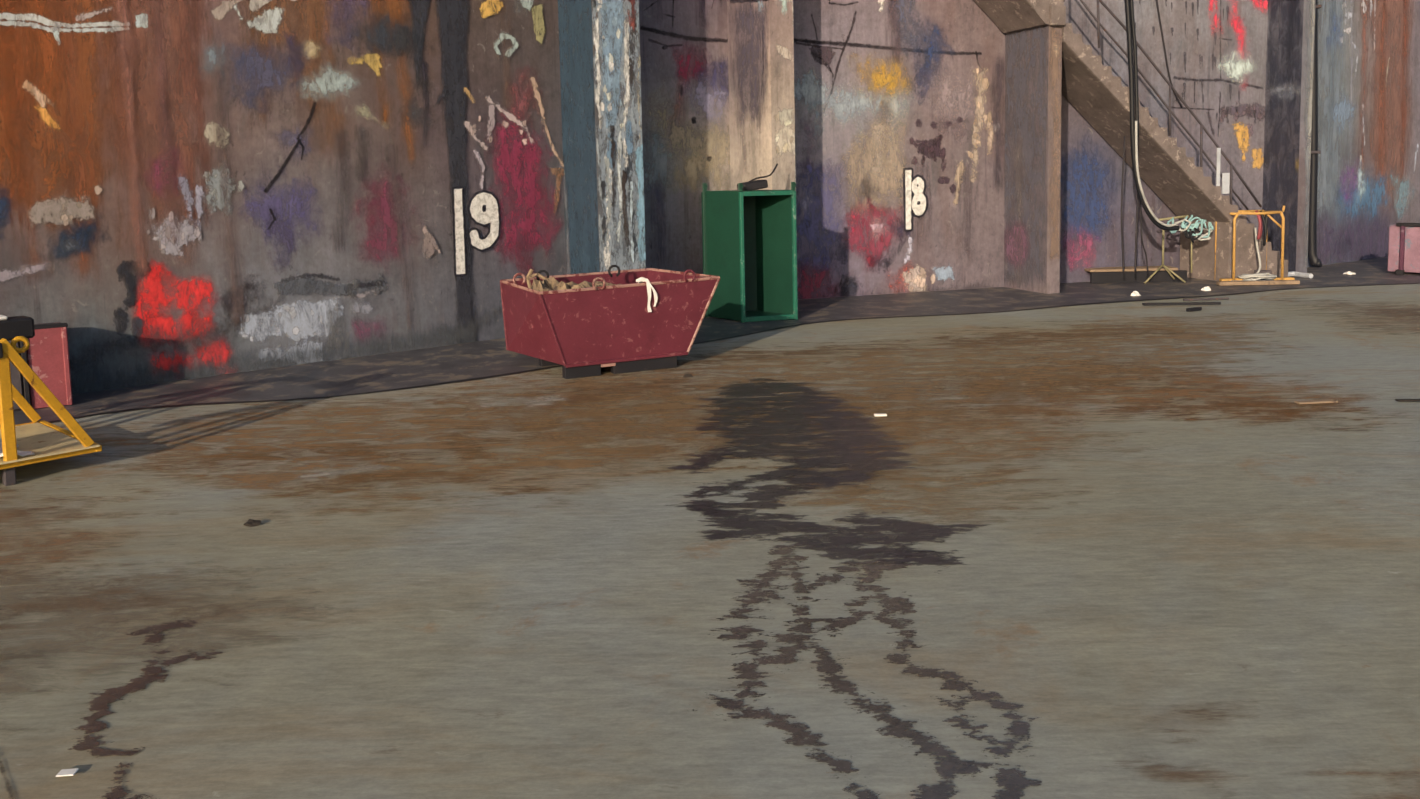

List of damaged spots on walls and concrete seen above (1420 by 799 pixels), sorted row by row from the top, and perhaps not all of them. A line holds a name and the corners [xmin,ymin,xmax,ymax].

corrosion [0,0,210,230]
corrosion [251,0,344,154]
peeling [592,0,646,272]
corrosion [1362,0,1411,208]
leakage [666,378,1042,799]
crack [0,761,14,798]
leakage [68,620,222,799]